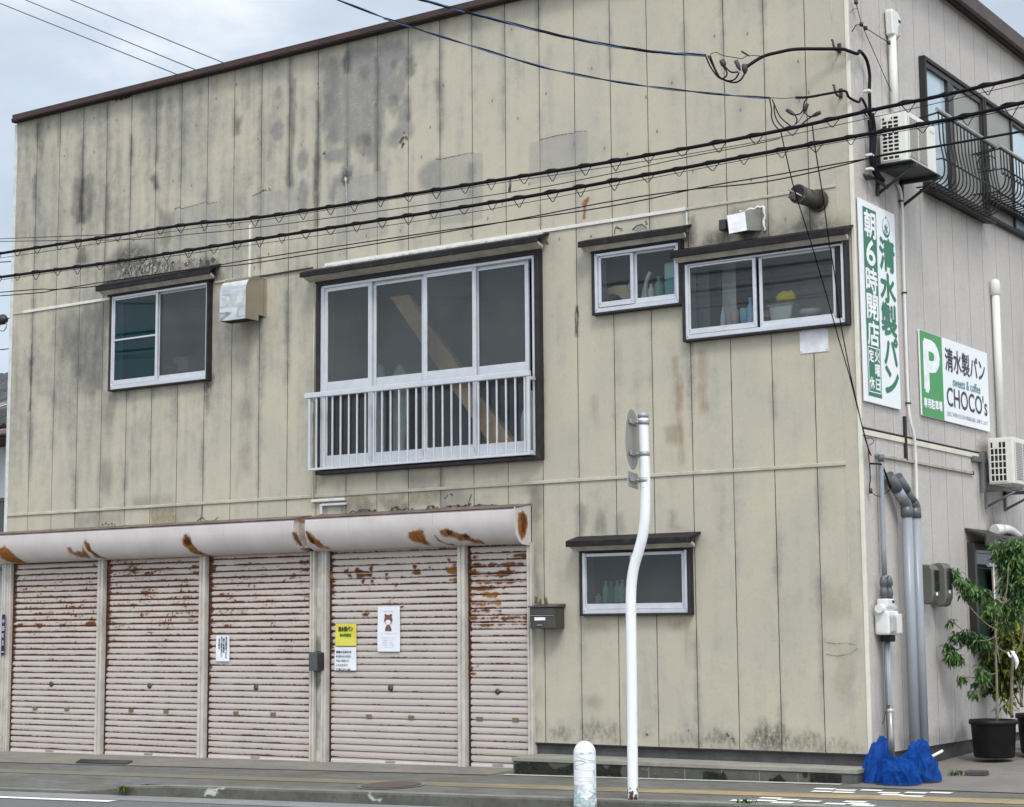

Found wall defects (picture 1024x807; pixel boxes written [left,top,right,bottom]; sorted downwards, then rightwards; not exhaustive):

water stain [322,46,413,224]
corrosion [293,519,324,547]
corrosion [0,546,28,564]
corrosion [68,542,114,574]
corrosion [182,535,217,575]
corrosion [329,565,433,608]
corrosion [446,553,527,627]